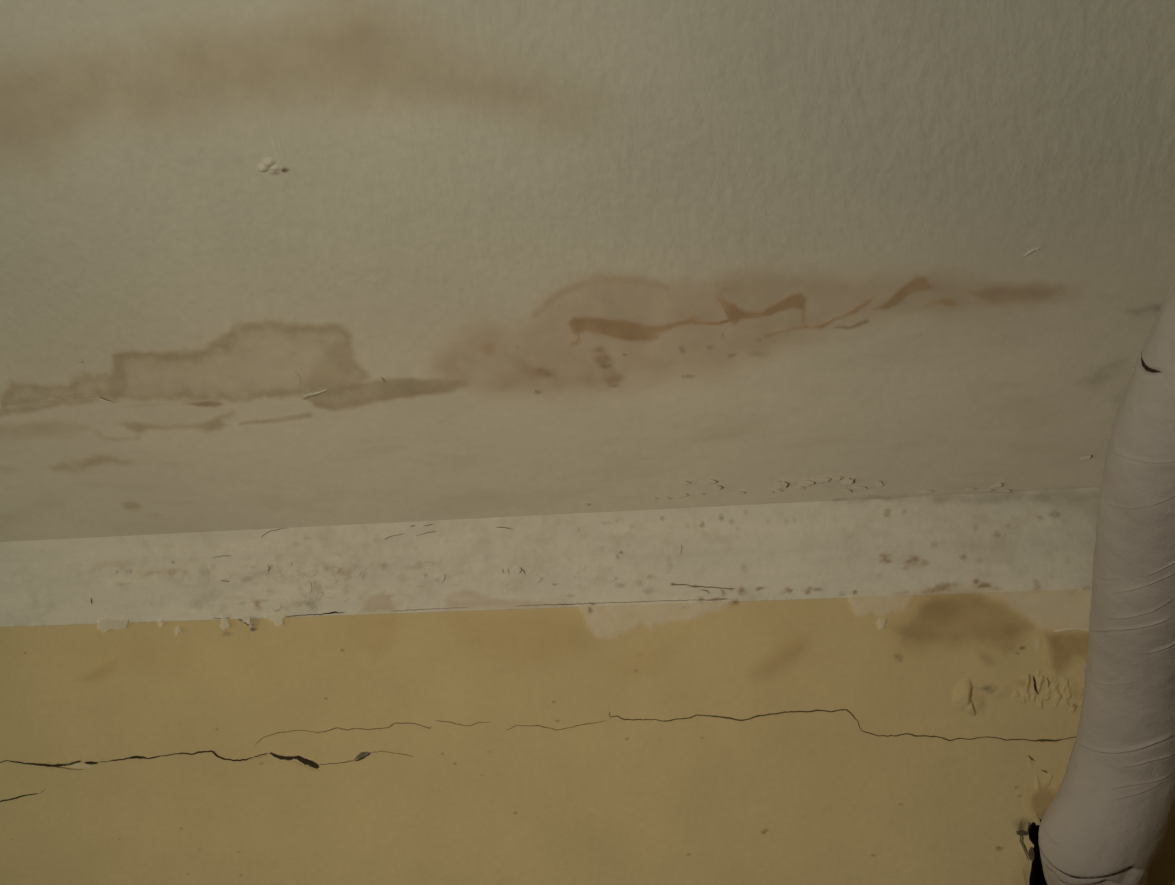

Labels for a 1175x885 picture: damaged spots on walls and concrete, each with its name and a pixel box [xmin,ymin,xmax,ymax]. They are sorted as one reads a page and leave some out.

water stain [569,294,805,344]
water stain [379,380,457,399]
water stain [899,598,1019,640]
crack [0,709,1075,802]
flaking render [1013,755,1059,885]